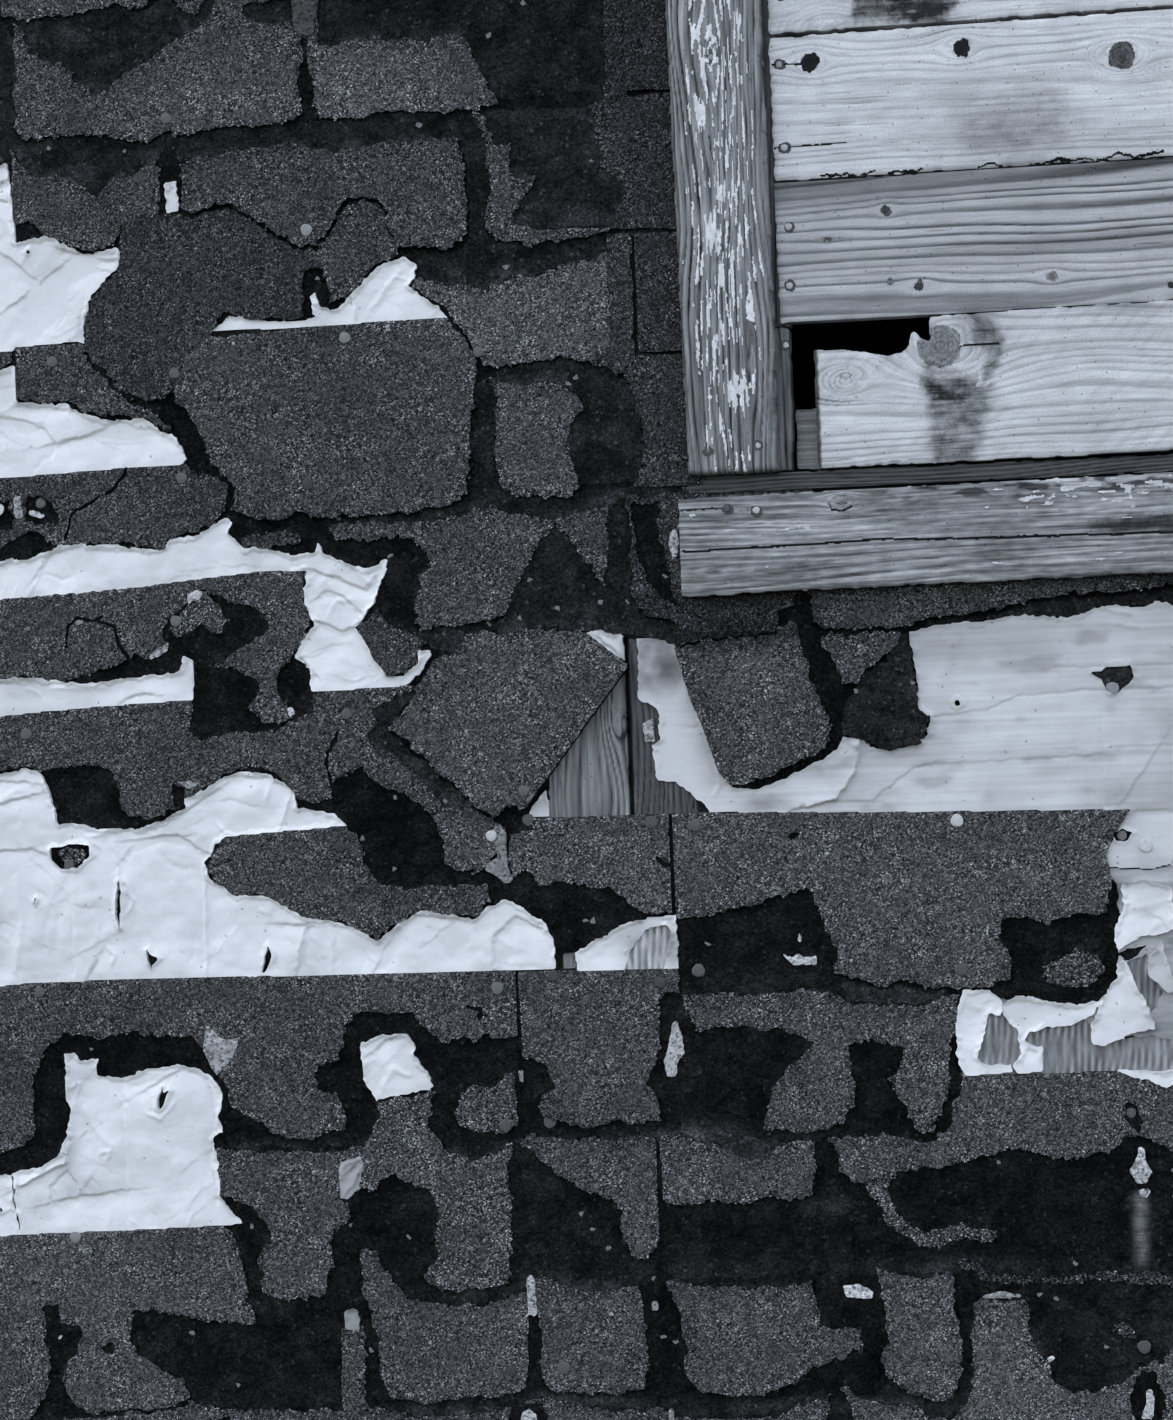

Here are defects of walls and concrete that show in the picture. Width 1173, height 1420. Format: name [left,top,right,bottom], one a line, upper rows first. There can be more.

damp [854,0,955,22]
peeling [682,0,764,472]
damp [925,378,985,459]